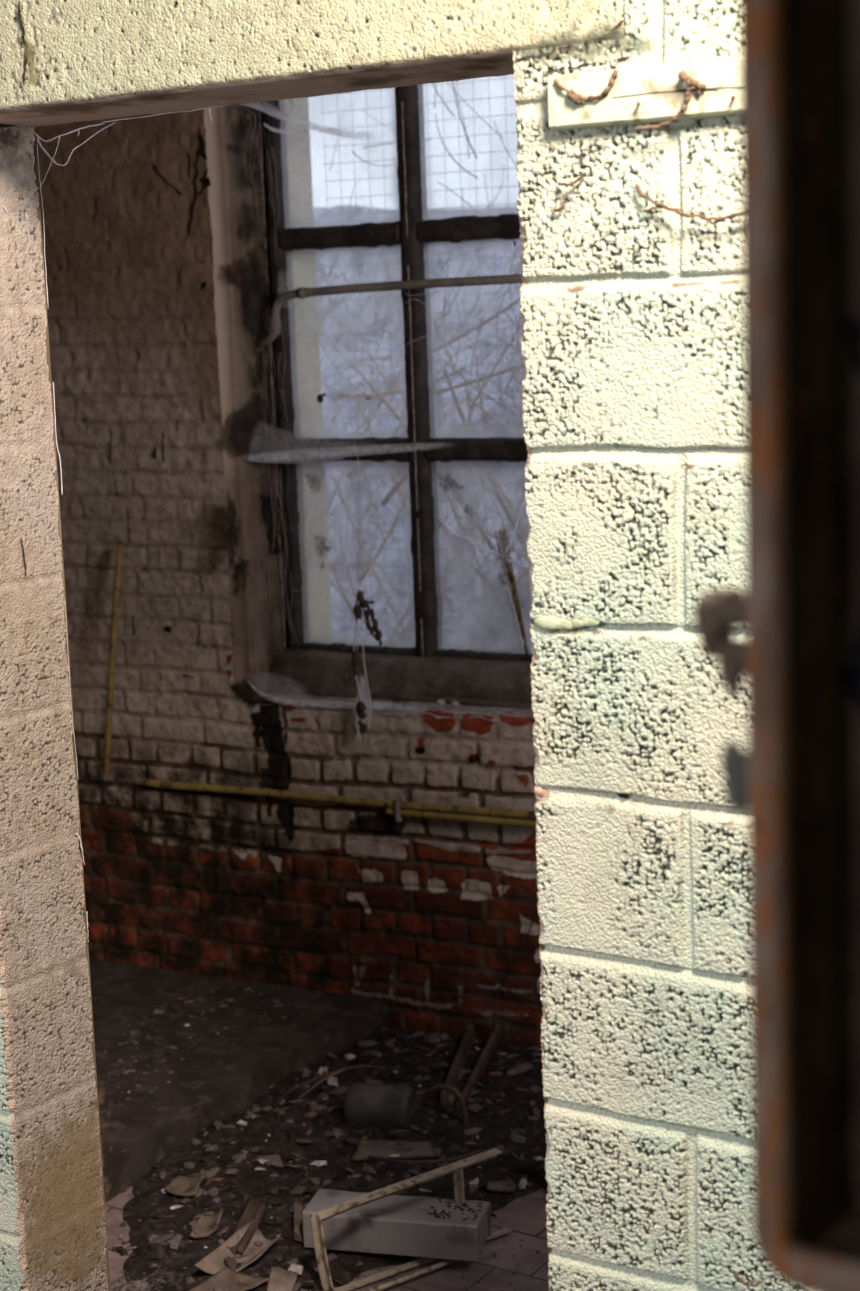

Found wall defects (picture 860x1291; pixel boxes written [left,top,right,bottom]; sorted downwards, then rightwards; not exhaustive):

crack [18,0,28,85]
crack [152,128,208,286]
water stain [226,493,249,592]
peeling [417,710,535,747]
water stain [251,701,296,843]
peeling [469,753,496,765]
peeling [477,832,537,851]
peeling [358,869,383,883]
peeling [427,878,510,901]